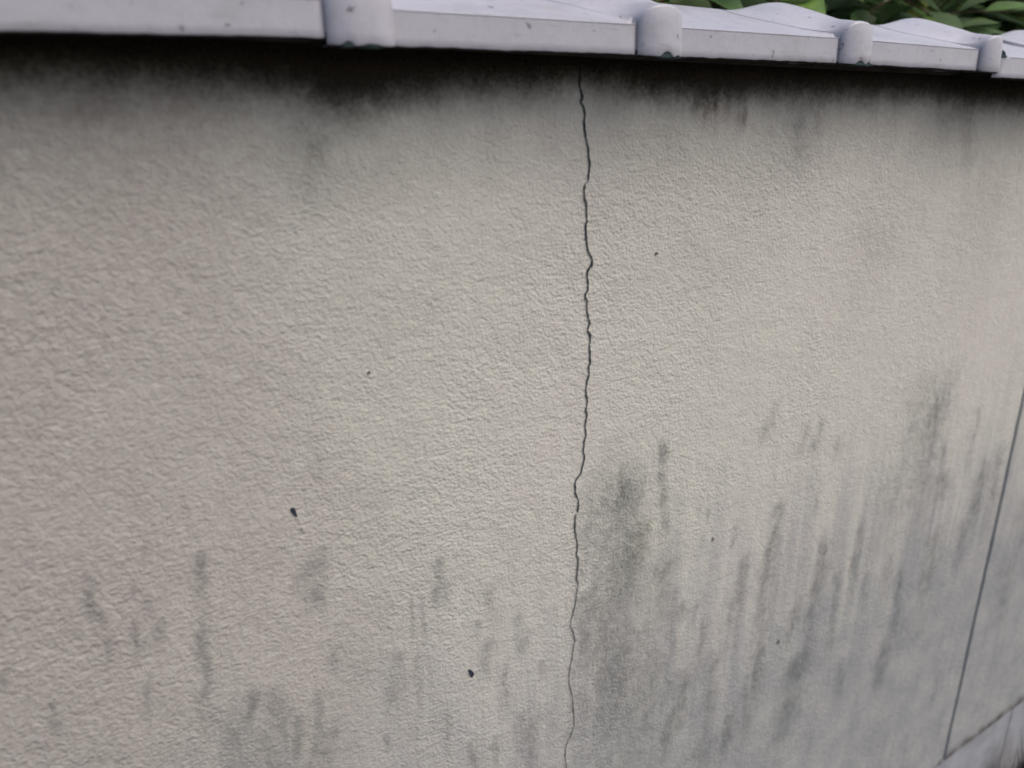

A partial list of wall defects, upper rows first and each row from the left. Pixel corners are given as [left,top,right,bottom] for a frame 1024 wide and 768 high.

crack [565,57,593,768]